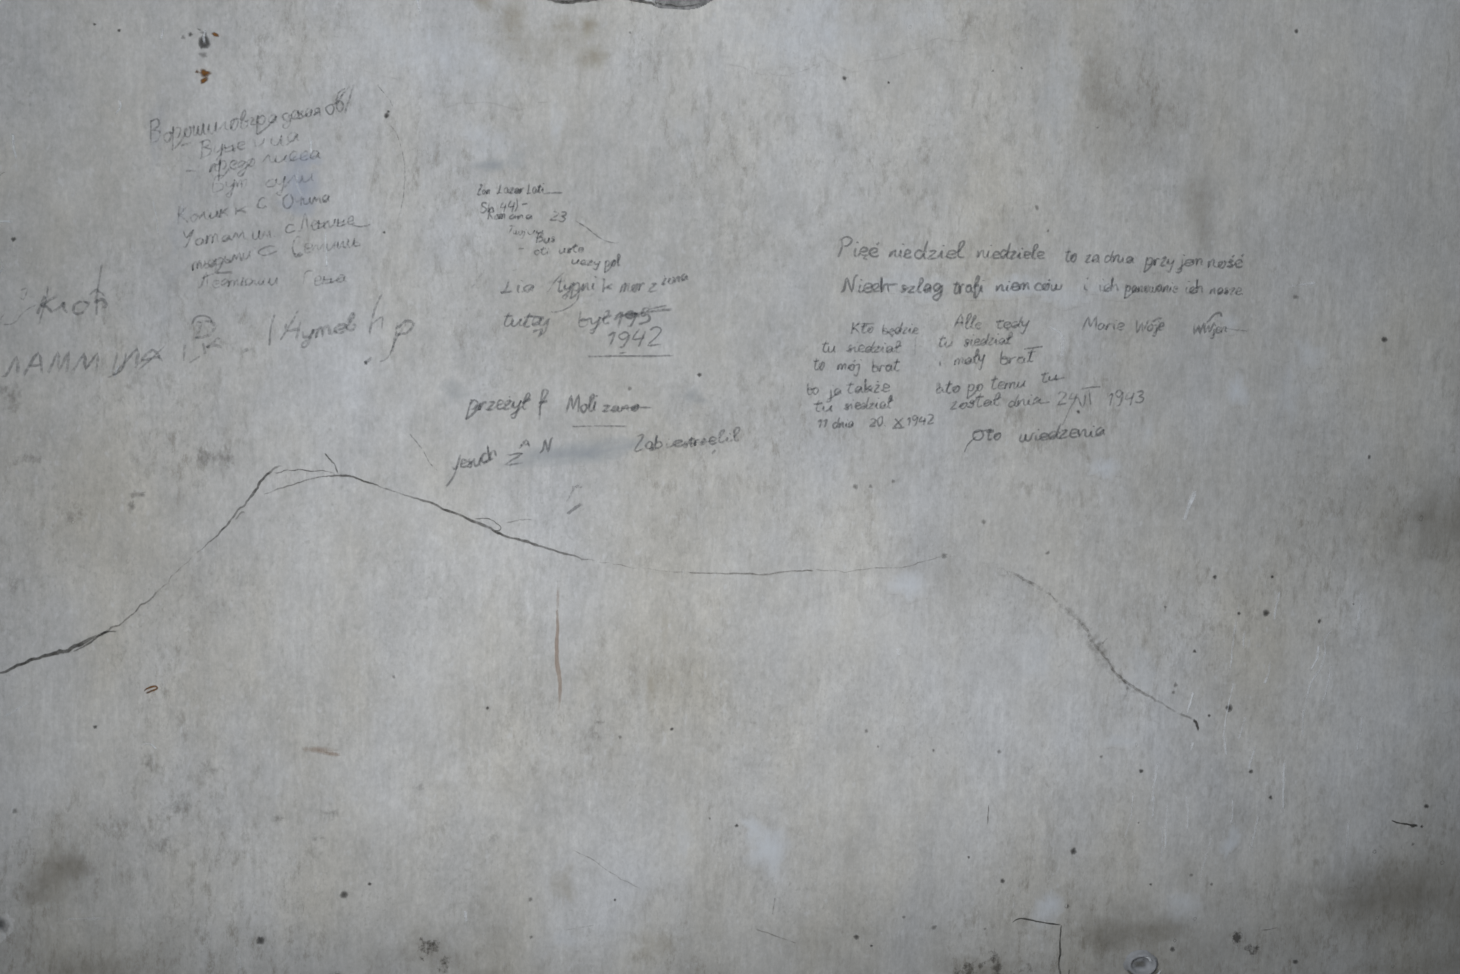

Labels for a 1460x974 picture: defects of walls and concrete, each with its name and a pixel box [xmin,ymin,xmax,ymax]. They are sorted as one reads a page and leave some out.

flaking render [652,0,712,10]
crack [221,454,376,531]
crack [423,501,564,553]
crack [0,631,112,673]